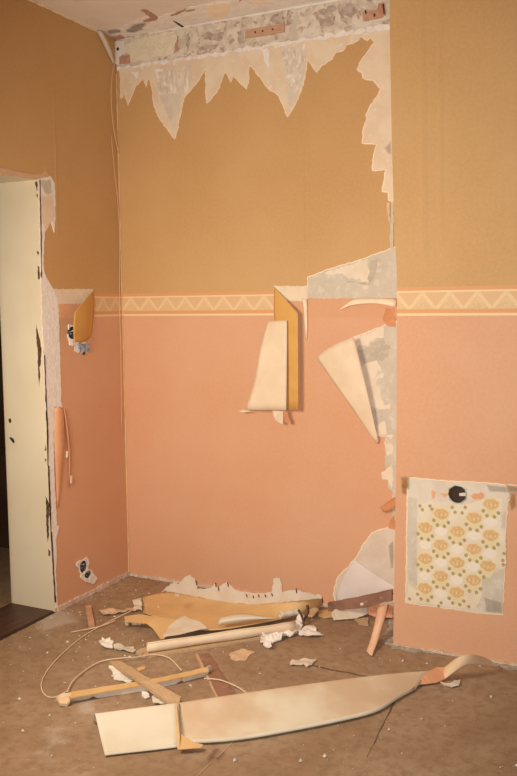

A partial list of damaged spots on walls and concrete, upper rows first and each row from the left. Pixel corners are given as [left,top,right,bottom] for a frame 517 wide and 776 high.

flaking render [111,0,329,40]
flaking render [307,248,397,298]
flaking render [35,177,79,608]
flaking render [357,322,397,493]